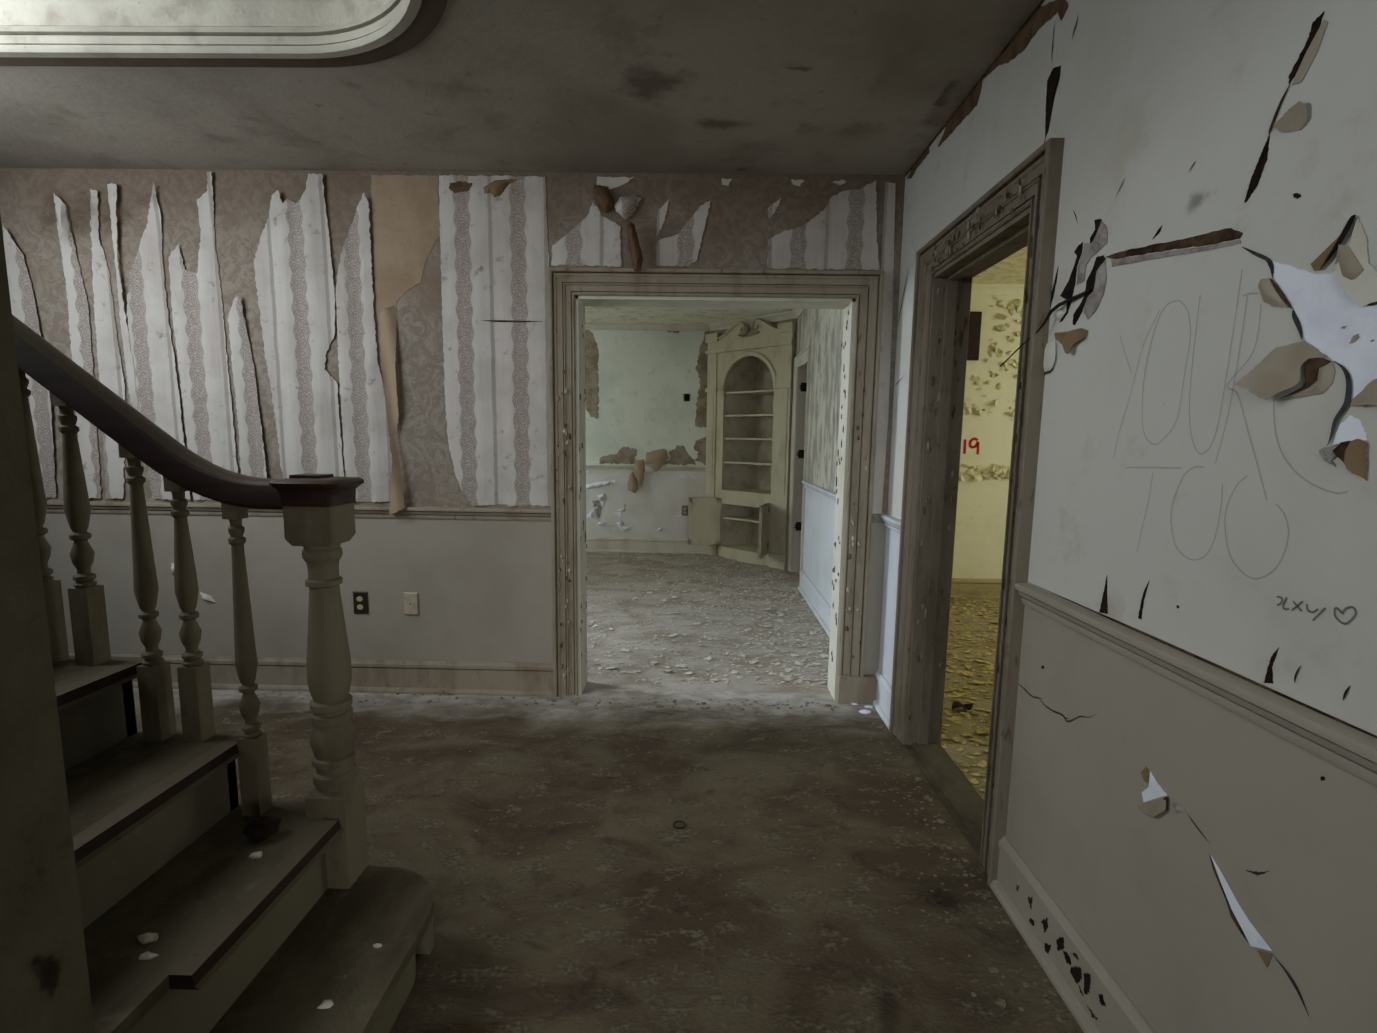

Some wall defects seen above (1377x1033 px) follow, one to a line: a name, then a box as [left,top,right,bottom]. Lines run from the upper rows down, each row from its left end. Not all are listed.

peeling [905,0,1069,179]
crack [1269,85,1290,134]
spalling [920,219,1108,546]
flaking render [1272,261,1377,445]
peeling [556,423,630,678]
crack [1019,582,1377,738]
flaking render [1142,771,1167,802]
peeling [1016,885,1106,1020]